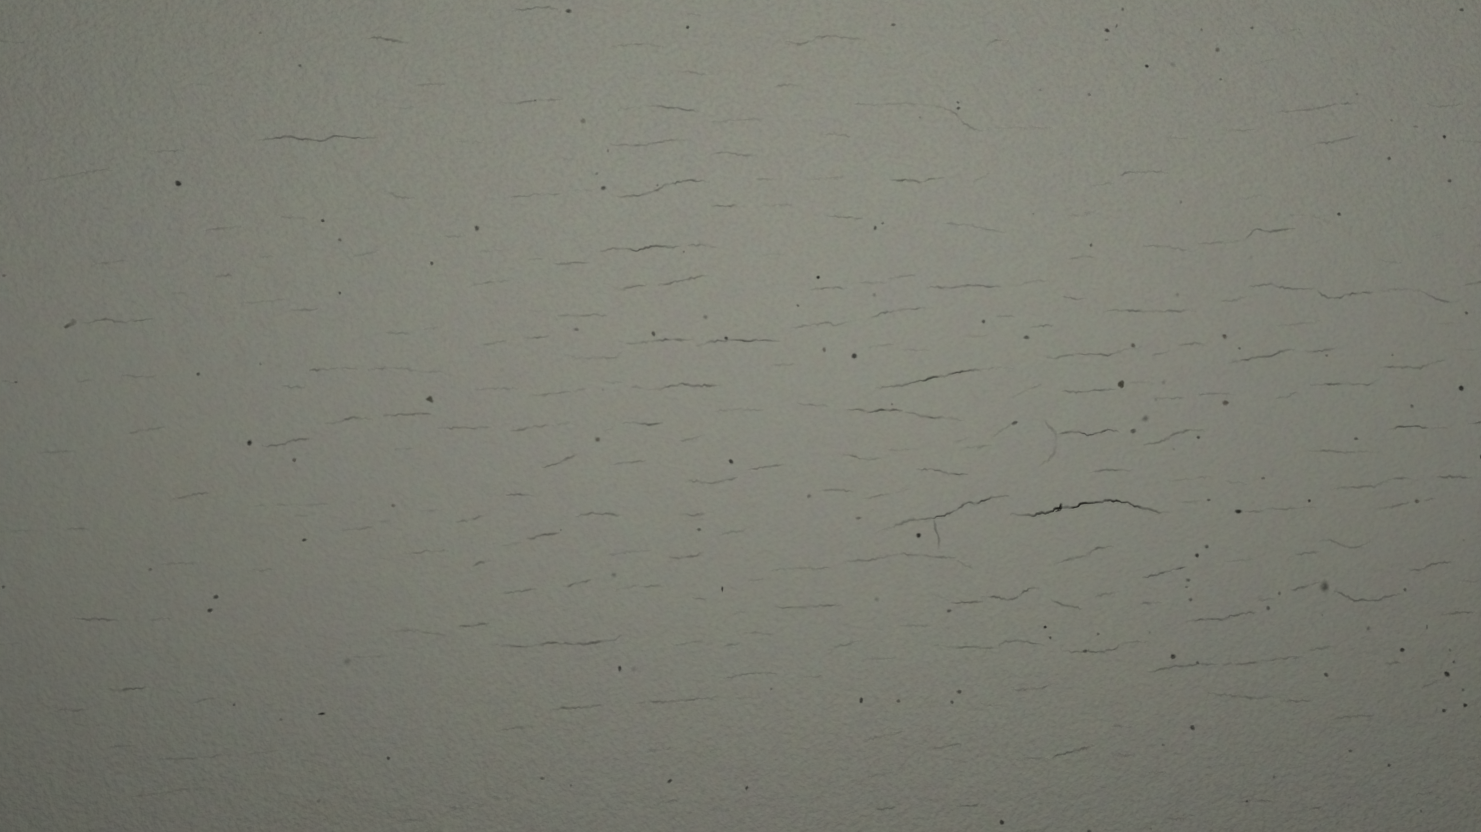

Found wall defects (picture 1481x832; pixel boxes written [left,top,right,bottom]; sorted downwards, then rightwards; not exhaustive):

crack [878,469,1169,533]